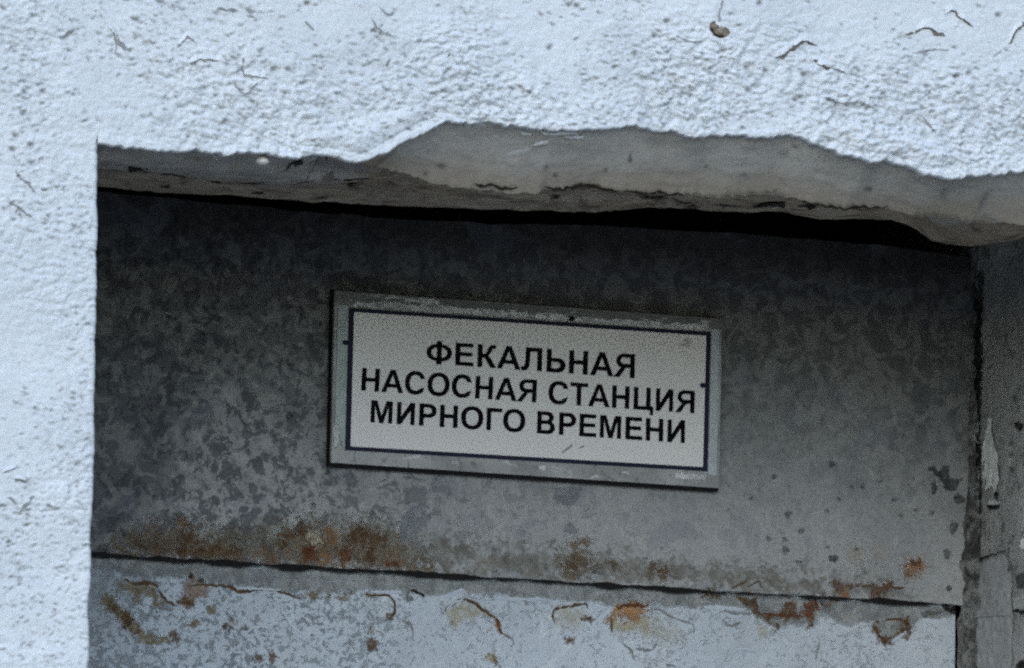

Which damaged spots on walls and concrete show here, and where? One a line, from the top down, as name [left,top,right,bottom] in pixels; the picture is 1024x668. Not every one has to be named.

spalling [361,122,1024,226]
rust [111,511,435,631]
rust [366,626,378,652]
rust [555,536,619,587]
rust [606,602,650,633]
rust [736,558,924,633]
rust [872,616,912,646]